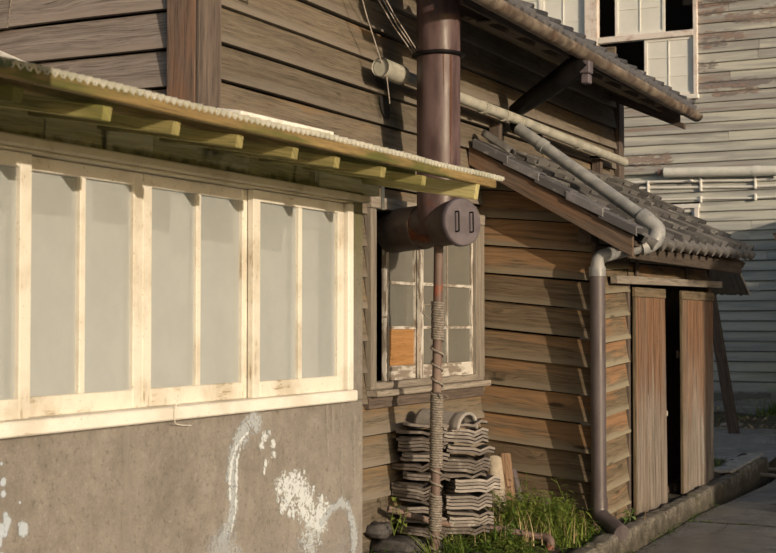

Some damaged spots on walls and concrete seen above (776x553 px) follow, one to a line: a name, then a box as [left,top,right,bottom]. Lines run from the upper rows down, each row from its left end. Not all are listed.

peeling [697,0,776,49]
peeling [698,60,775,97]
damp [208,411,276,553]
damp [0,512,28,553]
damp [273,469,358,553]